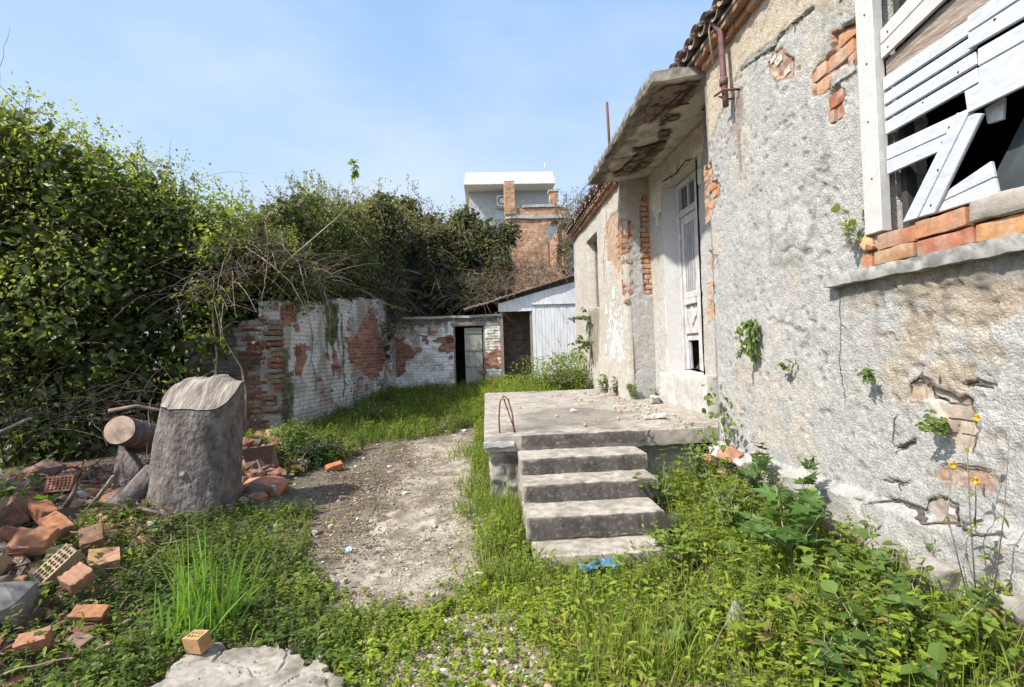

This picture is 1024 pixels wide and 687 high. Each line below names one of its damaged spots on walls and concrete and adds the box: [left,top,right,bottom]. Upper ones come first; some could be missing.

spalling [769,45,795,81]
flaking render [811,16,858,123]
flaking render [604,82,721,364]
flaking render [325,307,456,391]
flaking render [479,348,502,374]
crack [839,287,848,405]
spalling [909,382,981,452]
spalling [929,497,960,522]
spalling [939,463,997,491]